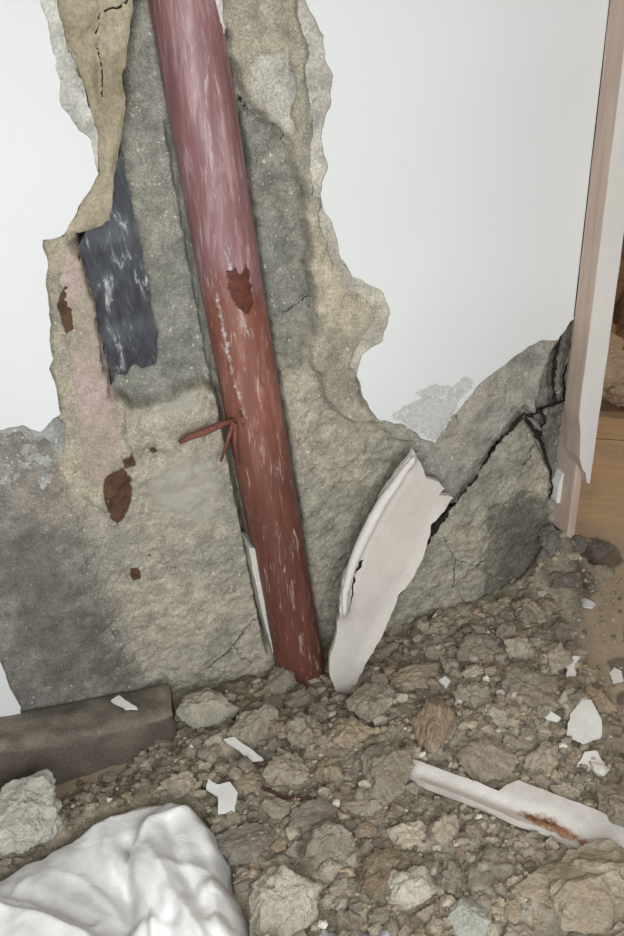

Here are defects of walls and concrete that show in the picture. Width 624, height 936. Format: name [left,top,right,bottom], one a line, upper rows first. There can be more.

spalling [0,0,276,712]
rust [226,267,253,314]
spalling [222,0,576,694]
crack [425,336,568,601]